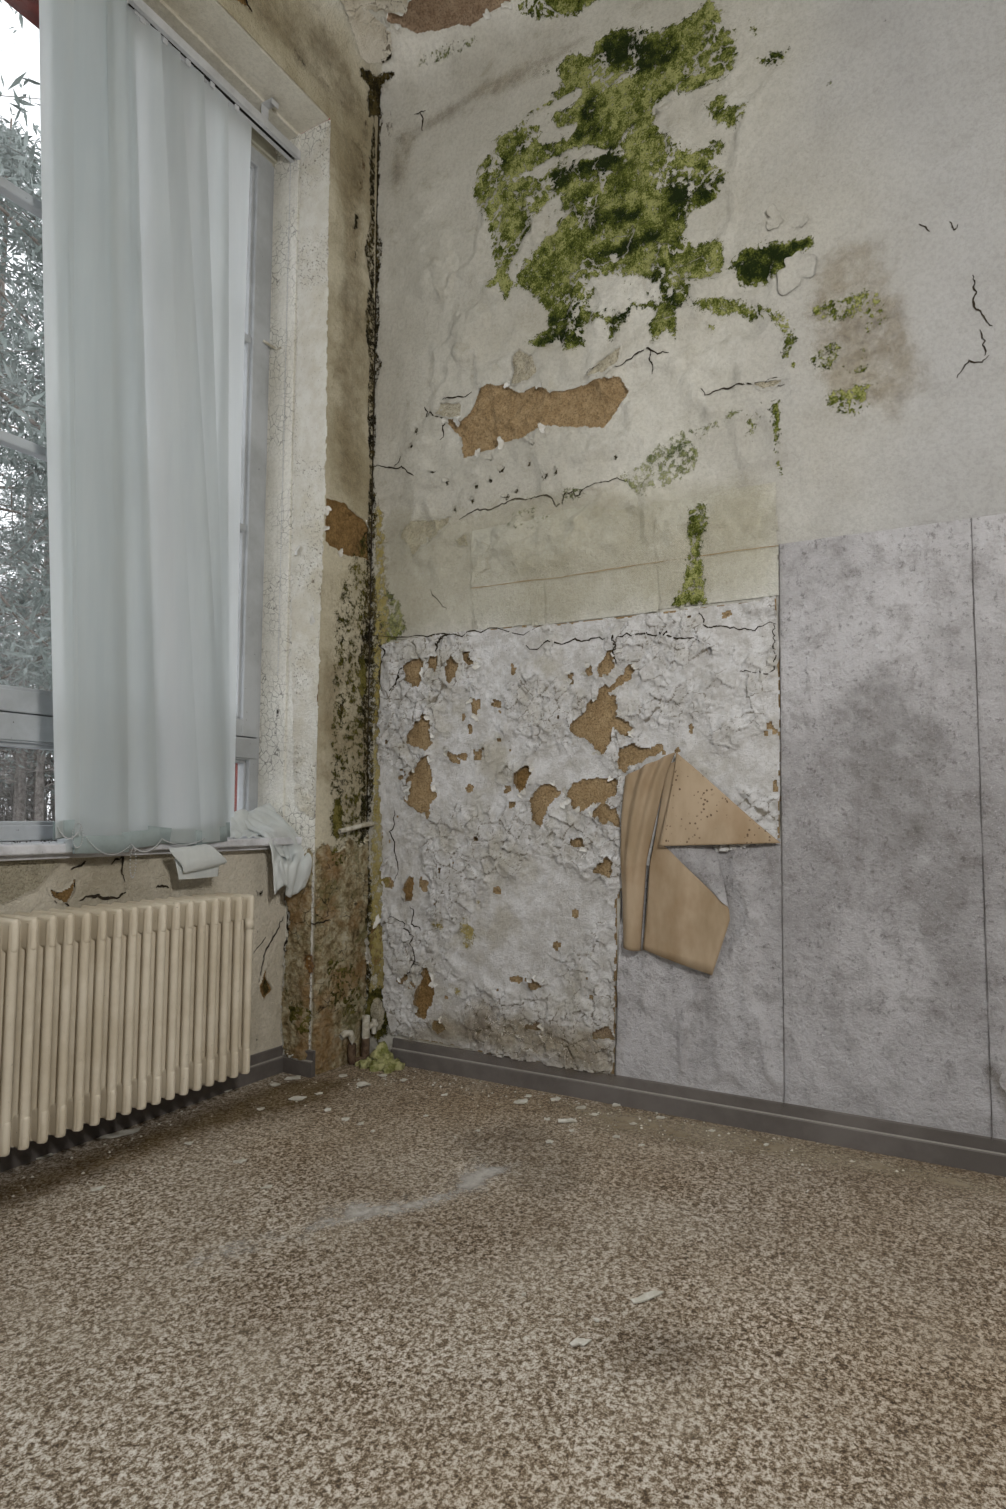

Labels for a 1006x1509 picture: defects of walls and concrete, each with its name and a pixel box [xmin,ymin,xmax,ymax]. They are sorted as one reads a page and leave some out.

spalling [340,0,525,64]
peeling [290,124,370,818]
leakage [330,109,390,1000]
spalling [399,345,634,573]
crack [957,275,993,377]
peeling [279,596,782,1075]